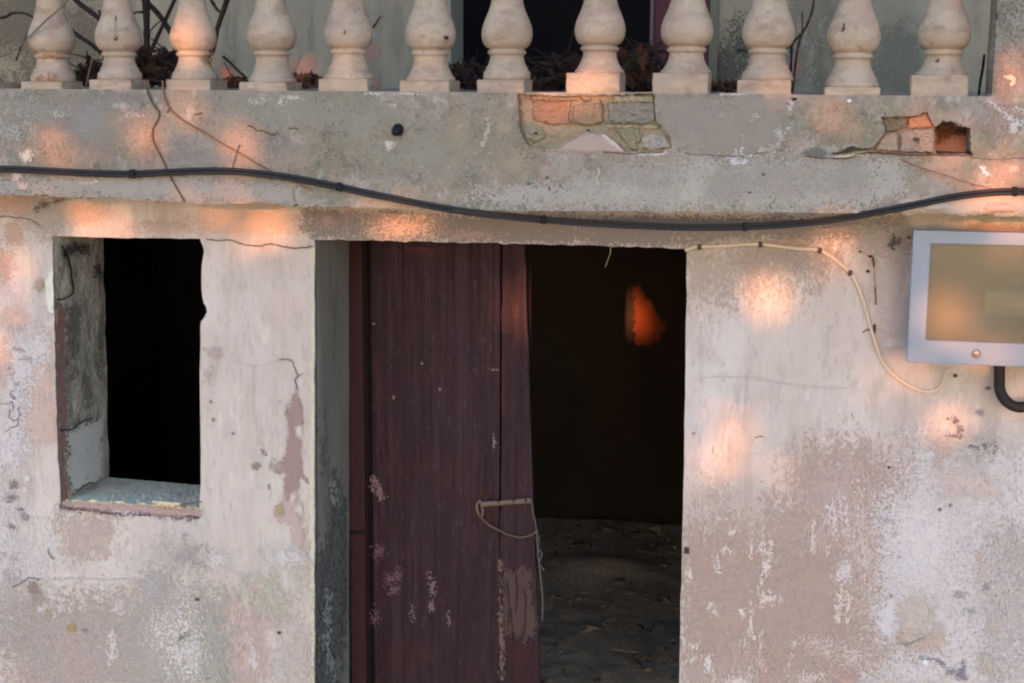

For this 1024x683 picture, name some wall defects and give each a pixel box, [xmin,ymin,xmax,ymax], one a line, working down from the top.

spalling [519,92,672,155]
flaking render [831,112,967,158]
crack [206,239,313,249]
crack [234,359,303,454]
peeling [251,247,315,683]
leakage [0,404,348,683]
peeling [679,414,947,683]